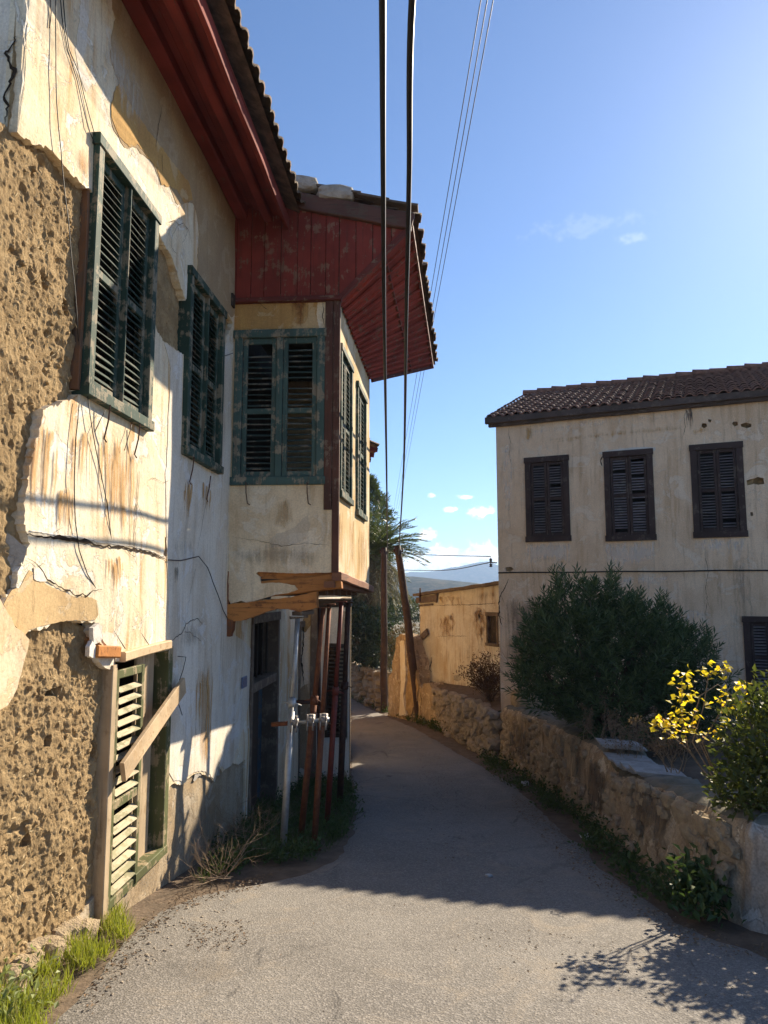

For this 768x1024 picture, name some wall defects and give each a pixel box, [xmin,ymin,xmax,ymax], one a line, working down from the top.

crack [3,36,17,119]
peeling [110,0,326,330]
flaking render [0,0,118,974]
crack [27,471,167,629]